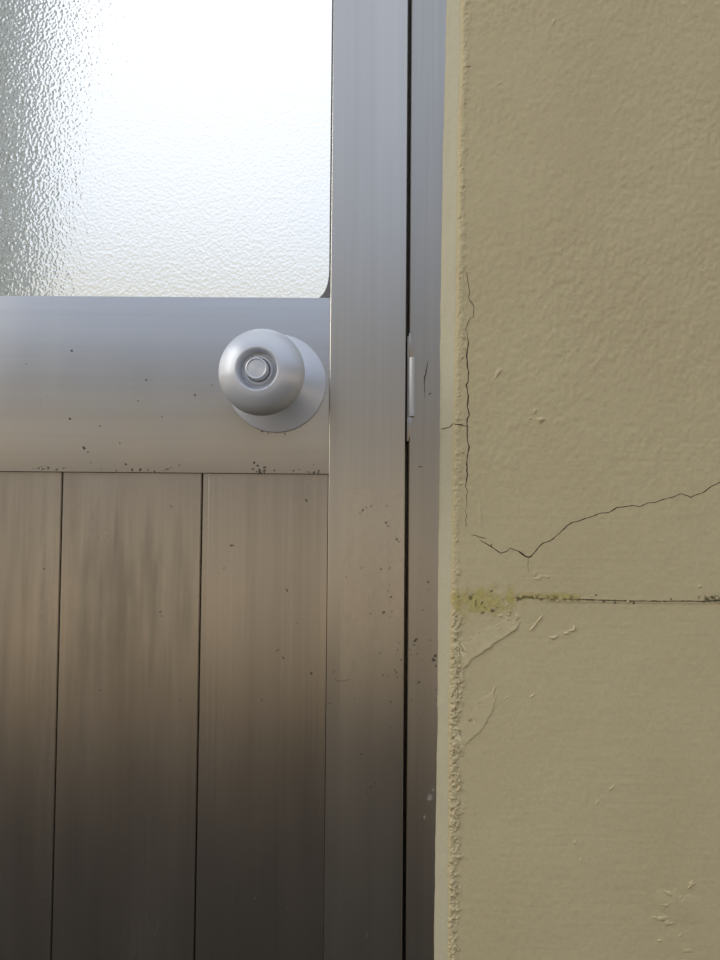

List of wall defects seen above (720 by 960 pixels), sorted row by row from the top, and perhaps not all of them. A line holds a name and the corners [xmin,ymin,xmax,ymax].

crack [442,276,720,558]
crack [513,594,720,604]
spalling [447,609,522,960]